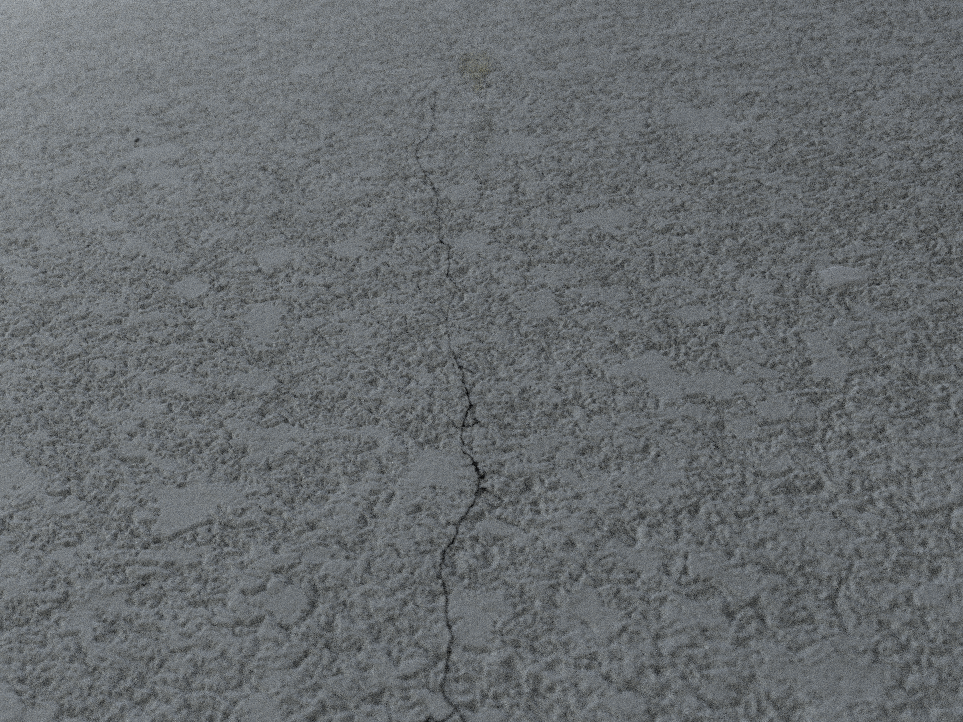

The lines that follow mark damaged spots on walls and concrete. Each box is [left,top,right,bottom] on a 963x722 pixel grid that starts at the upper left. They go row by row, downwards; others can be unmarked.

crack [415,92,492,722]